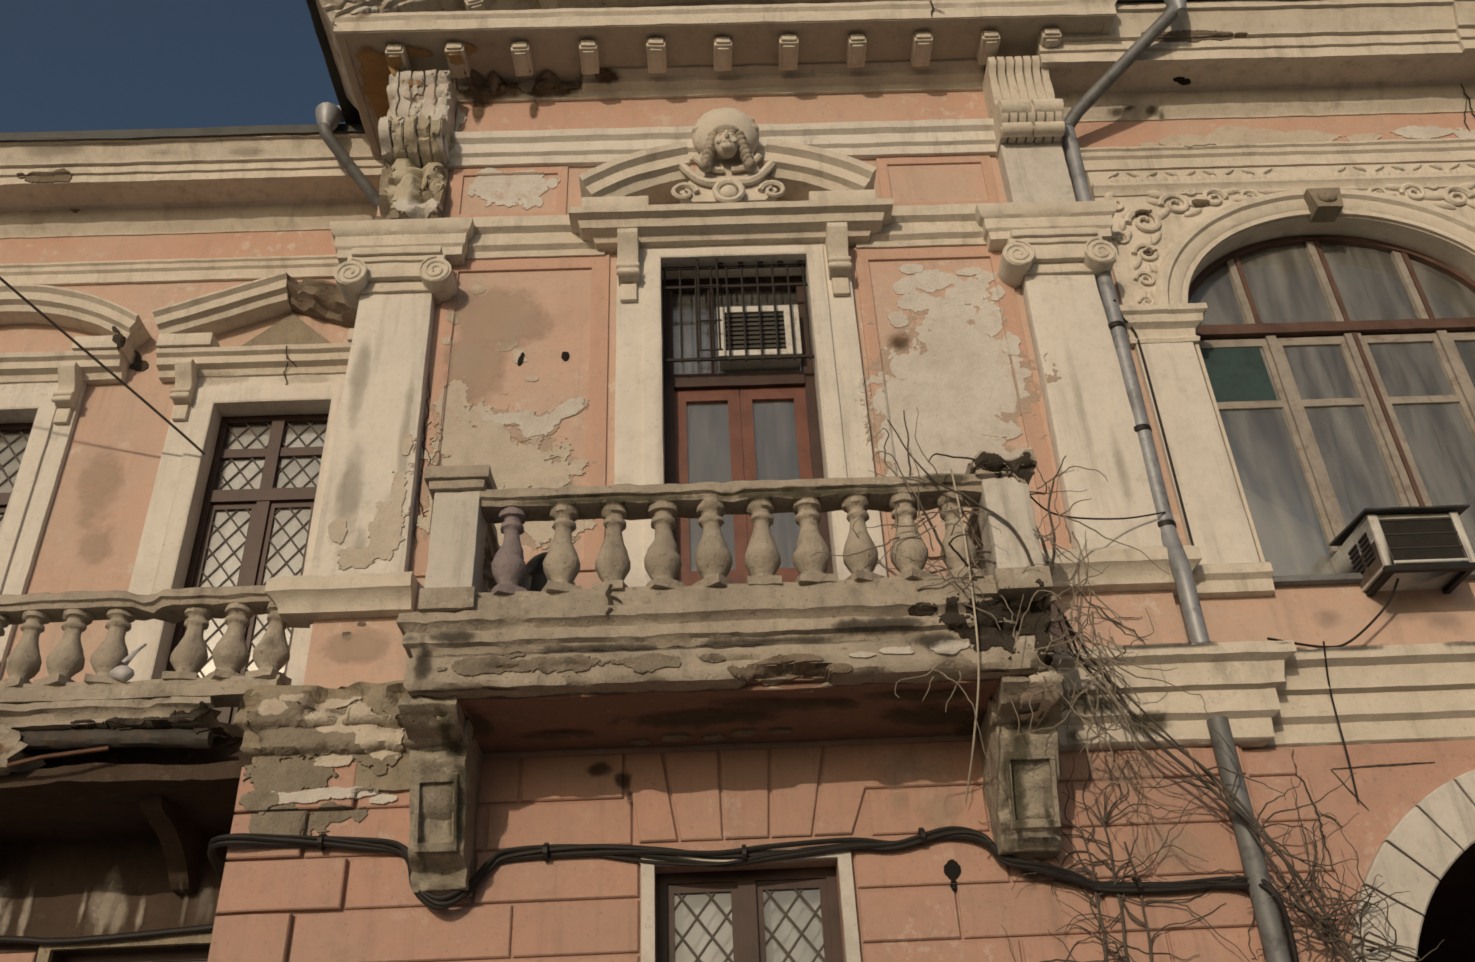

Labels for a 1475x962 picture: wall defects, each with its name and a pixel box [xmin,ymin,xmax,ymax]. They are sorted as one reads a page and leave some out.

flaking render [384,69,583,219]
crack [1461,84,1475,131]
crack [283,346,297,385]
peeling [328,311,596,571]
peeling [855,264,1062,483]
flaking render [6,693,405,848]
spalling [437,579,1064,728]
water stain [639,690,984,734]
water stain [913,633,953,647]